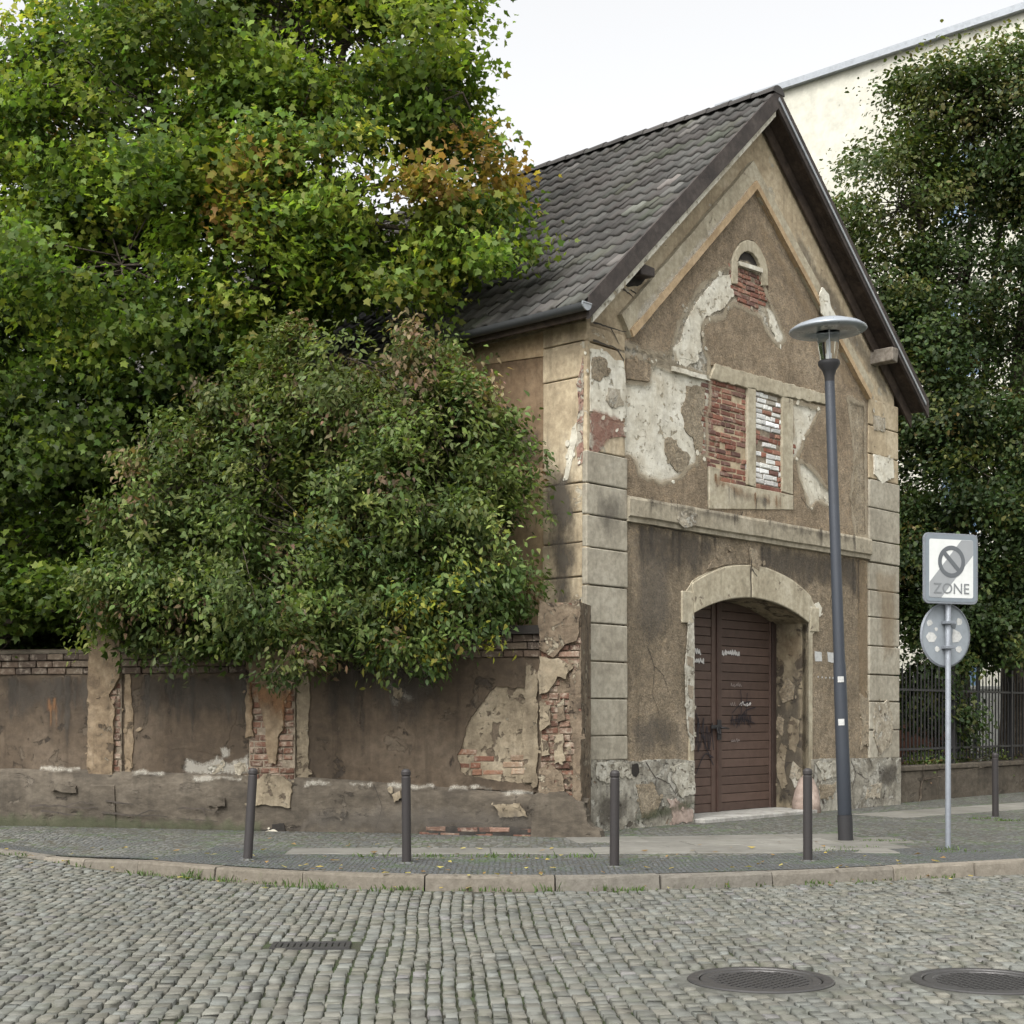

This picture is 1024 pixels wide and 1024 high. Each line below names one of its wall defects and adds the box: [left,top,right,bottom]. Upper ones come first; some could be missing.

spalling [584,261,787,485]
peeling [563,422,580,481]
spalling [793,400,829,510]
spalling [847,396,894,538]
peeling [122,674,142,772]
peeling [207,664,312,808]
spalling [457,662,541,788]
peeling [776,678,801,789]